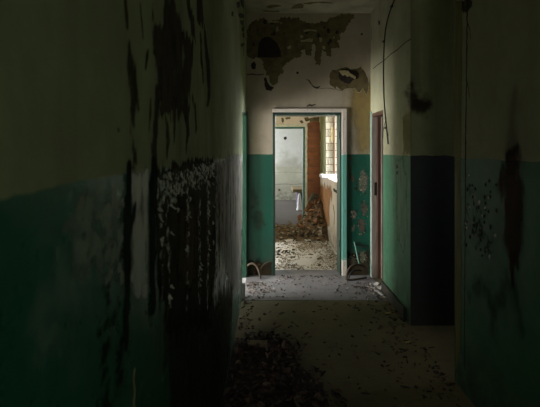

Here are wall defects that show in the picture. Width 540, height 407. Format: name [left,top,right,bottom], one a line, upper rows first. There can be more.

leakage [127,42,140,127]
flaking render [232,0,355,91]
flaking render [329,66,369,94]
leakage [145,0,211,316]
peeling [347,156,370,235]
peeling [155,152,243,407]